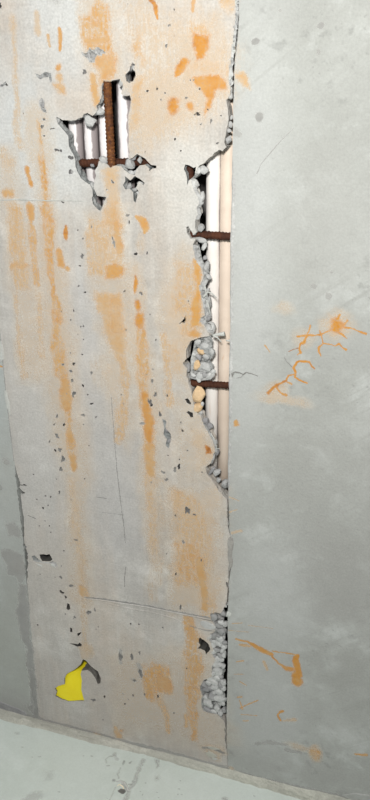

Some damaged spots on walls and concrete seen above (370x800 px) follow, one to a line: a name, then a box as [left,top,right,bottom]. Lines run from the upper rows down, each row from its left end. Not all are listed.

corrosion [35,12,62,51]
corrosion [81,0,116,105]
spalling [56,63,155,211]
corrosion [128,0,248,149]
corrosion [2,120,77,472]
corrosion [86,167,124,279]
corrosion [96,276,157,553]
corrosion [172,259,202,347]
spalling [190,157,236,502]
corrosion [267,314,367,404]
corrosion [174,493,215,741]
corrosion [230,623,303,687]